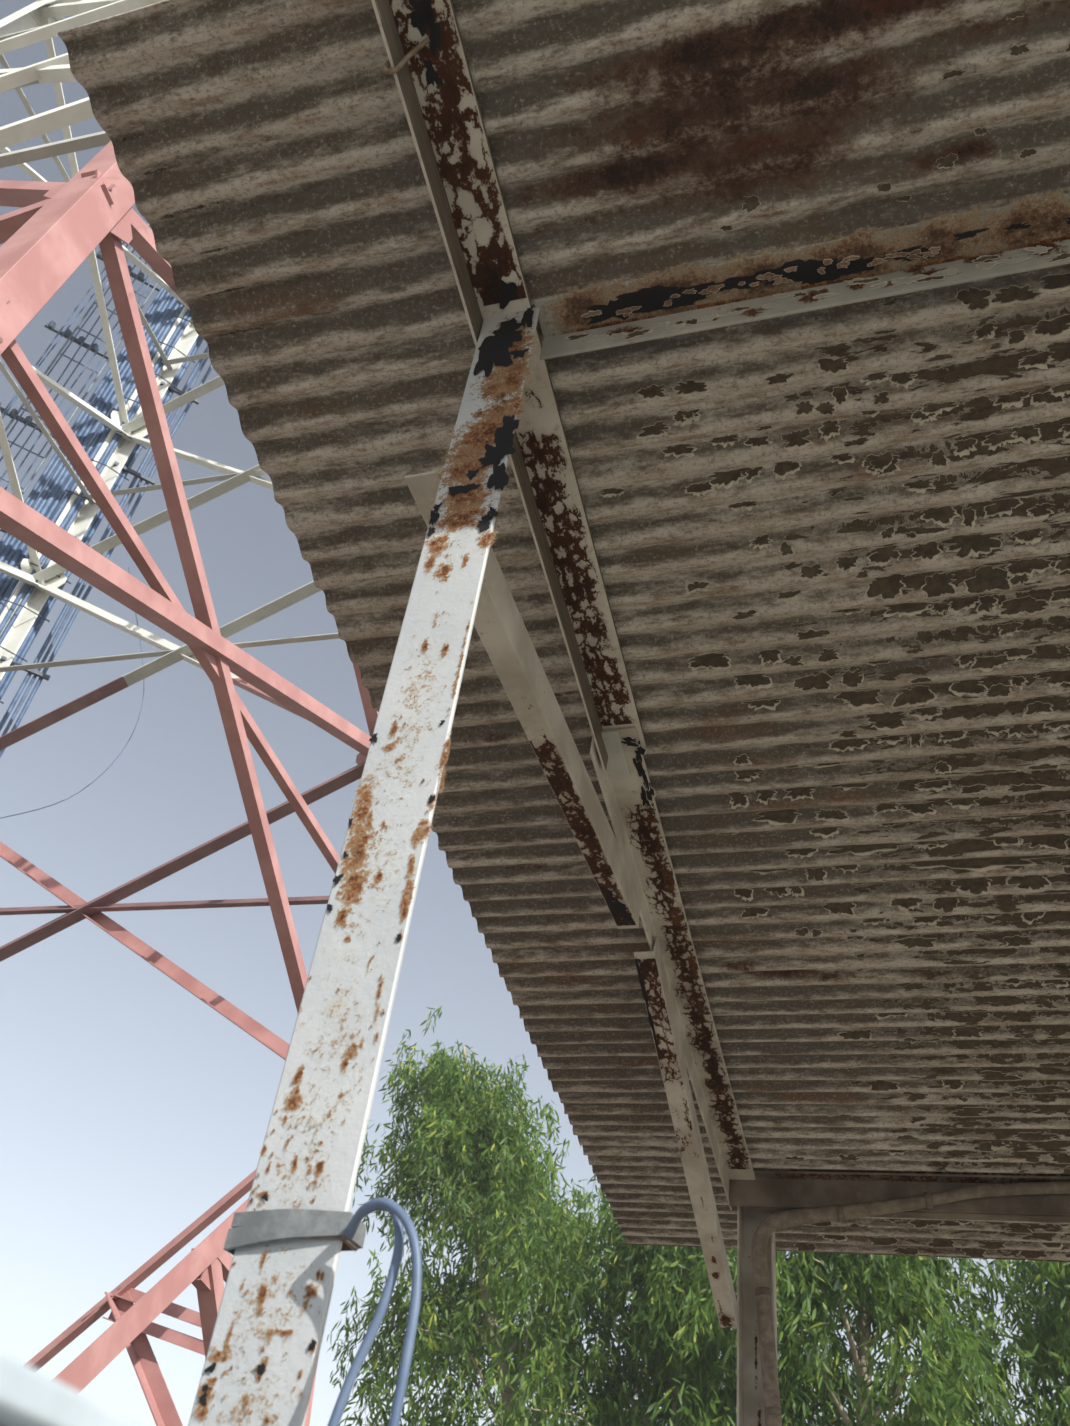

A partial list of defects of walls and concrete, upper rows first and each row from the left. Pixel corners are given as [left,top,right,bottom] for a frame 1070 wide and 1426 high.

peeling [955,273,1070,369]
peeling [599,488,628,498]
corrosion [389,0,1070,1169]
peeling [636,353,1070,769]
peeling [728,753,1070,954]
peeling [837,1012,914,1041]
peeling [823,1061,1070,1106]
peeling [794,1219,1070,1259]
corrosion [192,1245,324,1426]
corrosion [717,1300,734,1329]